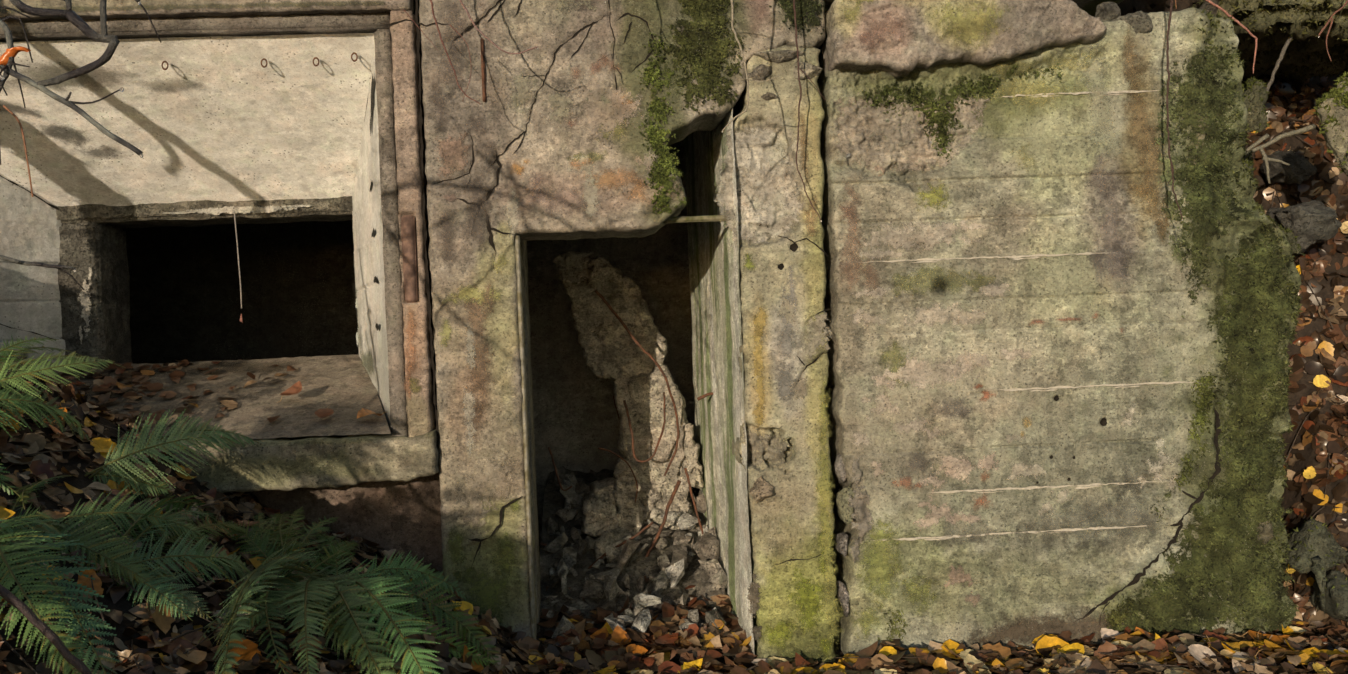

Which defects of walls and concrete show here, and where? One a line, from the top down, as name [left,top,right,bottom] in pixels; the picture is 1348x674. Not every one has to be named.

crack [379,0,667,449]
spalling [714,125,806,248]
spalling [742,425,791,471]
crack [469,496,523,565]
crack [1076,407,1222,623]